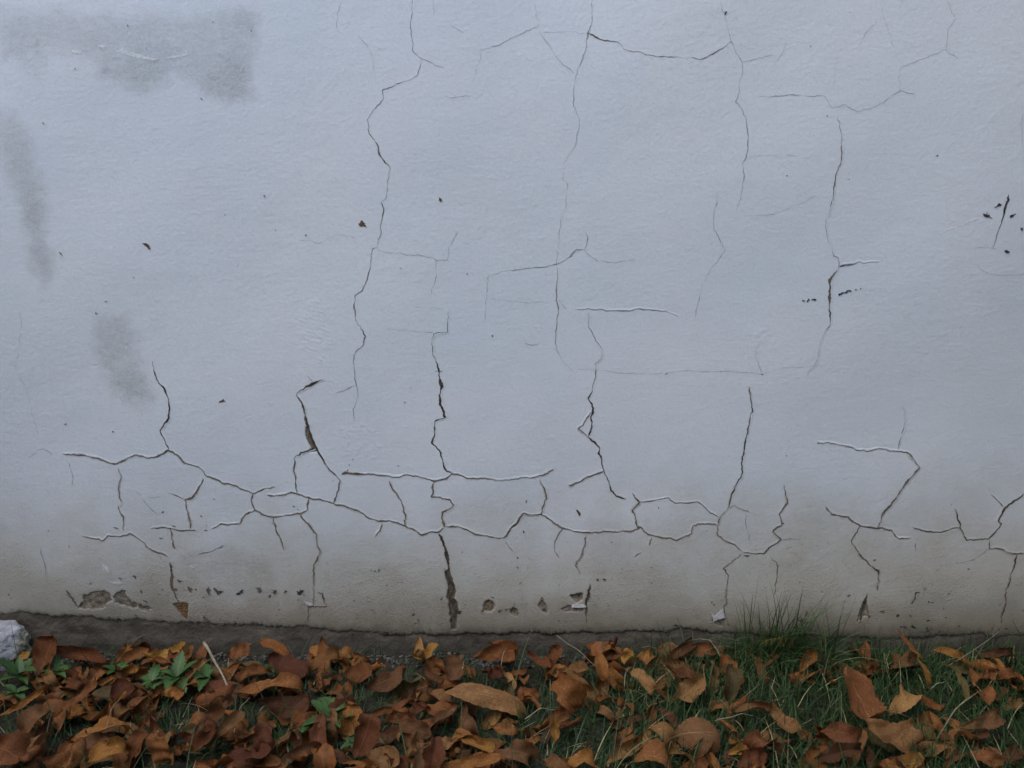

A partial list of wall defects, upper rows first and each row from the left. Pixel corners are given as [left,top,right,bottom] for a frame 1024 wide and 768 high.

crack [972,195,1022,276]
crack [15,0,956,629]
crack [818,405,1024,623]
spalling [81,575,150,616]
spalling [481,597,518,615]
spalling [563,593,586,611]